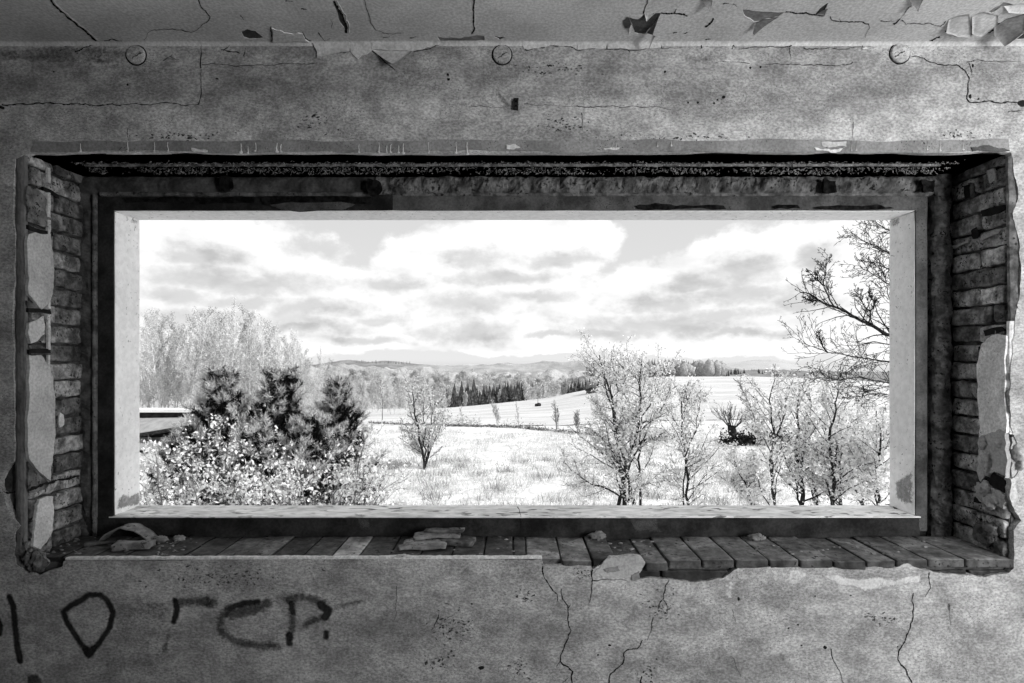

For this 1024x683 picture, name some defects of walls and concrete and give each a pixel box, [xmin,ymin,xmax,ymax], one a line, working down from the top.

crack [2,0,439,140]
spalling [743,9,783,36]
crack [523,0,1024,112]
peeling [946,2,1024,46]
spalling [972,429,1024,549]
spalling [14,531,50,573]
crack [542,566,626,683]
crack [608,581,669,683]
crack [898,572,931,683]